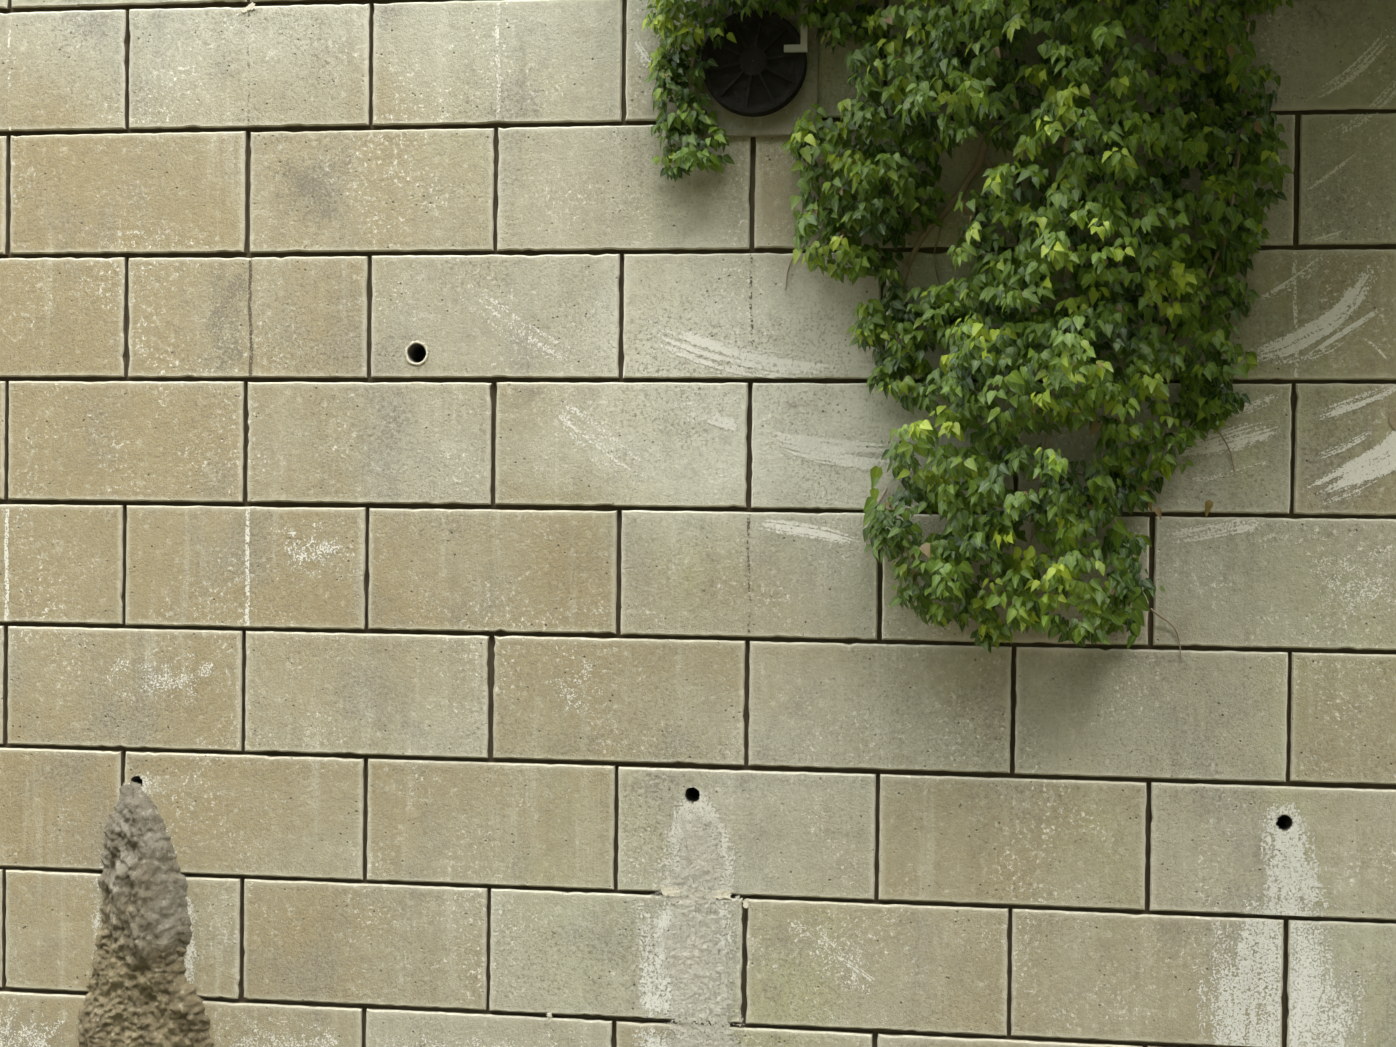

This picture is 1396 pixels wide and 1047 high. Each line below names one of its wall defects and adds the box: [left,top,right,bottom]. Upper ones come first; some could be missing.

crack [246,259,254,377]
leakage [625,786,746,1047]
leakage [1175,796,1371,1047]